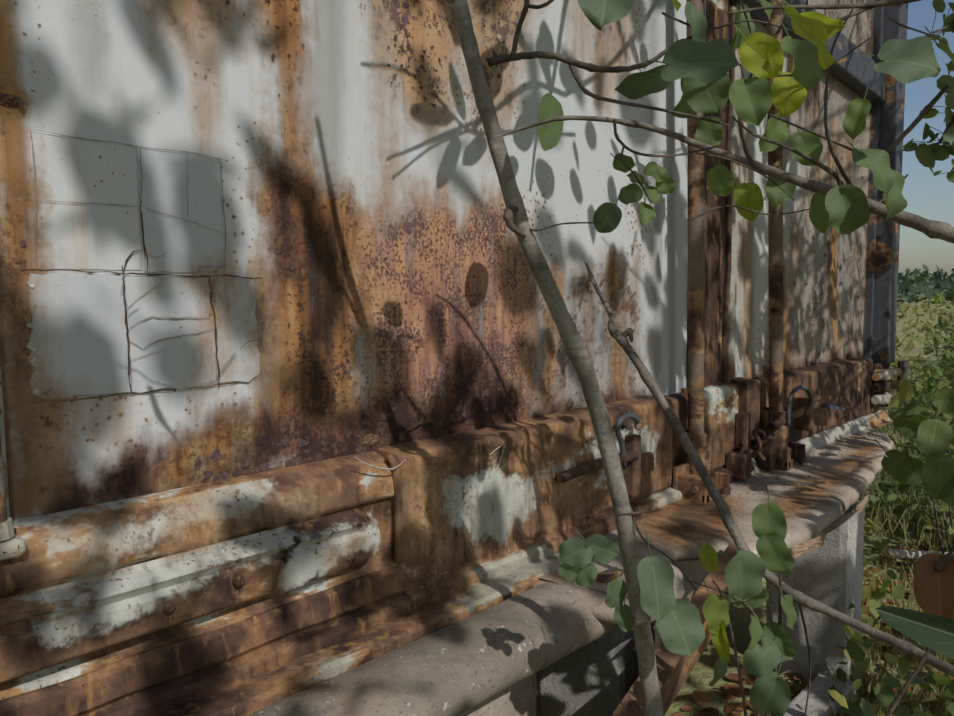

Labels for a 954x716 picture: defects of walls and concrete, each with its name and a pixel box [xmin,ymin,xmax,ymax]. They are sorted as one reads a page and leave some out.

corrosion [785,74,871,187]
crack [19,130,266,402]
corrosion [0,0,585,515]
corrosion [550,242,647,404]
corrosion [742,218,769,379]
corrosion [783,192,868,371]
peeling [35,479,381,647]
corrosion [409,475,491,580]
peeling [440,444,540,545]